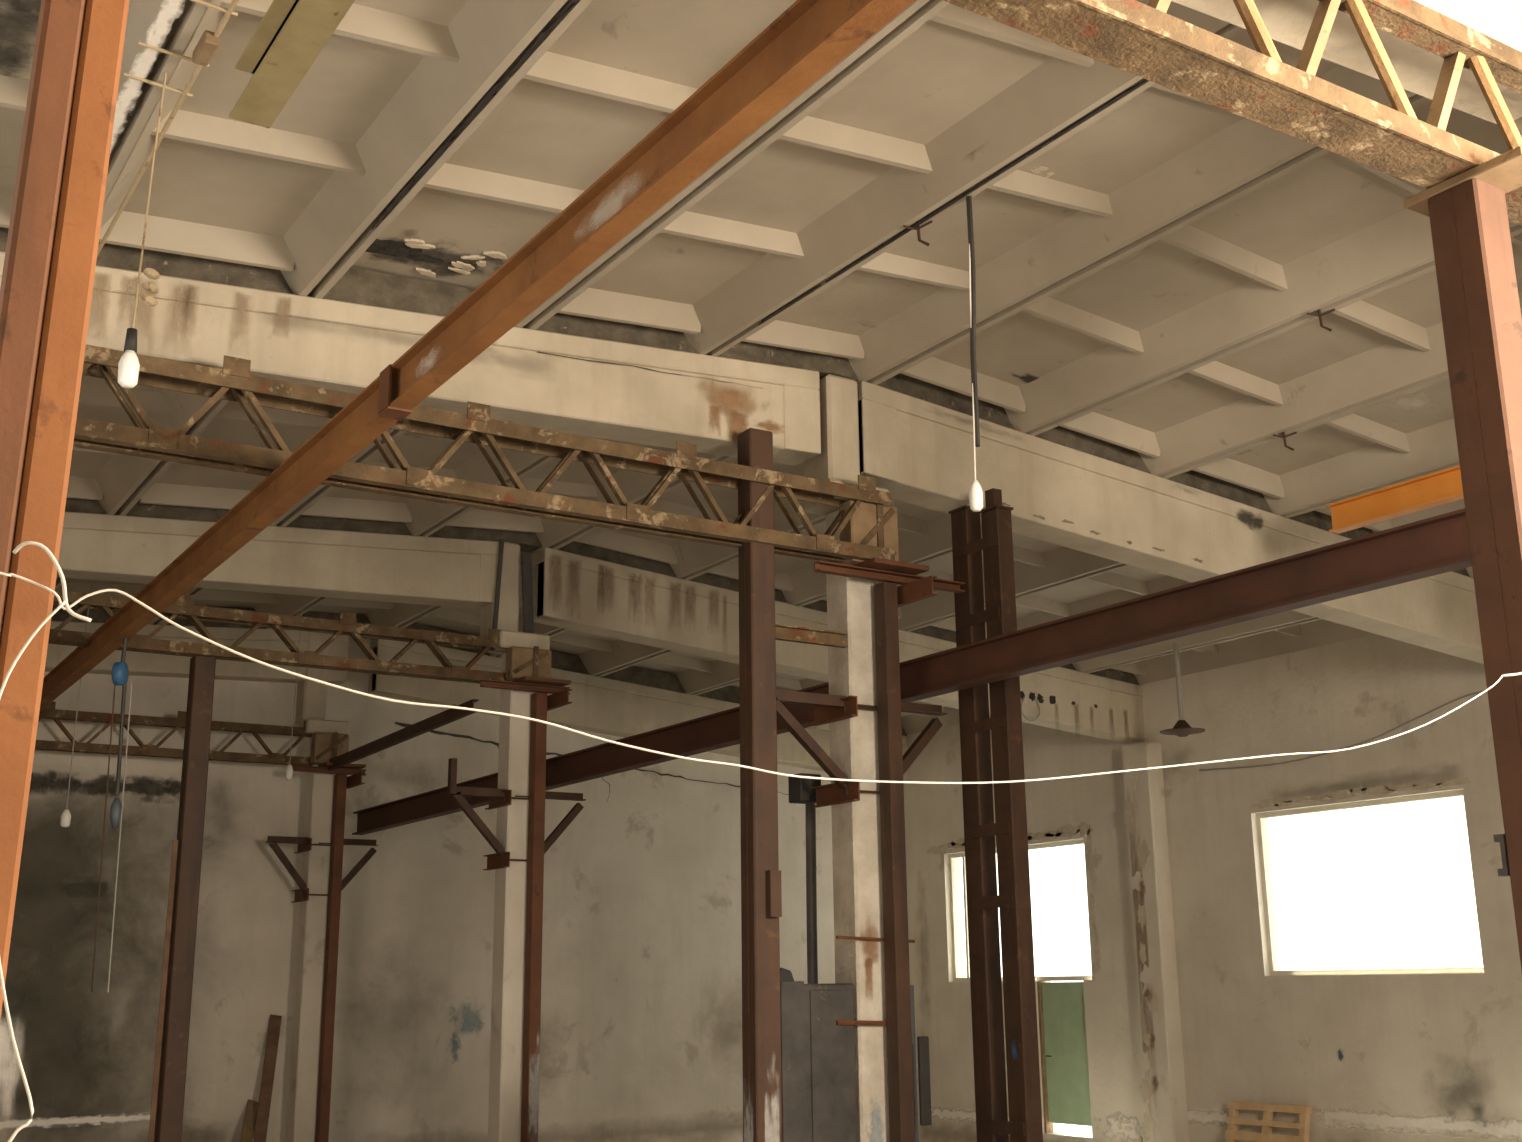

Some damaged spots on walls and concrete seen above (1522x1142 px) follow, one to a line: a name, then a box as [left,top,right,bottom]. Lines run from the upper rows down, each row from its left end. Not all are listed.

water stain [94,276,106,315]
corrosion [710,385,779,440]
water stain [552,557,577,594]
water stain [672,585,726,619]
water stain [0,799,159,1142]
flaking render [1105,756,1159,1142]